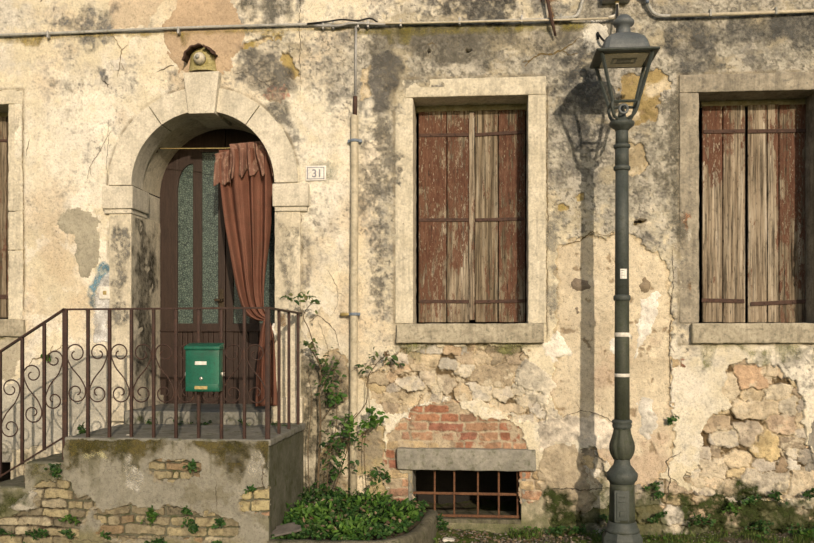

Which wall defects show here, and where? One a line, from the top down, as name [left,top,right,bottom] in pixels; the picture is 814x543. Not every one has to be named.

flaking render [263,53,300,104]
crack [524,37,579,66]
peeling [617,68,671,126]
crack [87,120,110,179]
peeling [550,232,615,423]
peeling [629,234,686,488]
flaking render [0,479,240,543]
flaking render [149,458,201,483]
flaking render [320,398,527,506]
flaking render [518,470,542,504]
spalling [580,445,614,485]